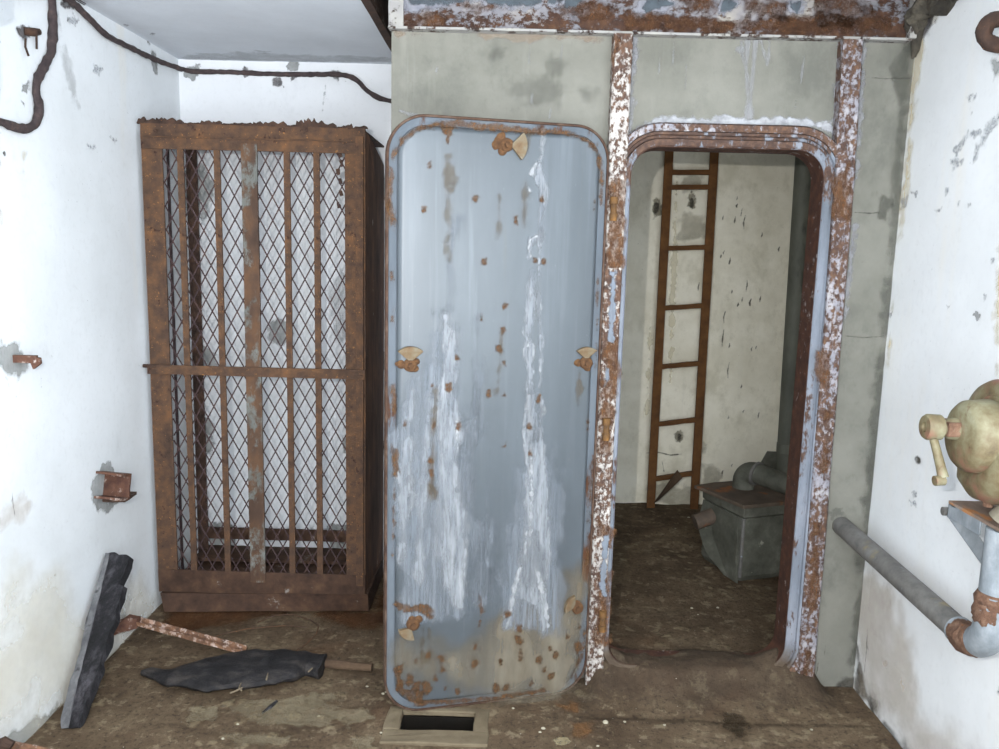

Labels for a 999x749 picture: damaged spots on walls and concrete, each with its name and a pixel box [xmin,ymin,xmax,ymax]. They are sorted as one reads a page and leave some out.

corrosion [405,12,446,27]
corrosion [561,0,892,62]
spalling [903,0,958,59]
damp [637,40,833,133]
corrosion [606,179,627,268]
corrosion [830,163,852,222]
corrosion [598,338,622,453]
corrosion [815,351,830,385]
corrosion [820,440,830,476]
corrosion [807,548,820,610]